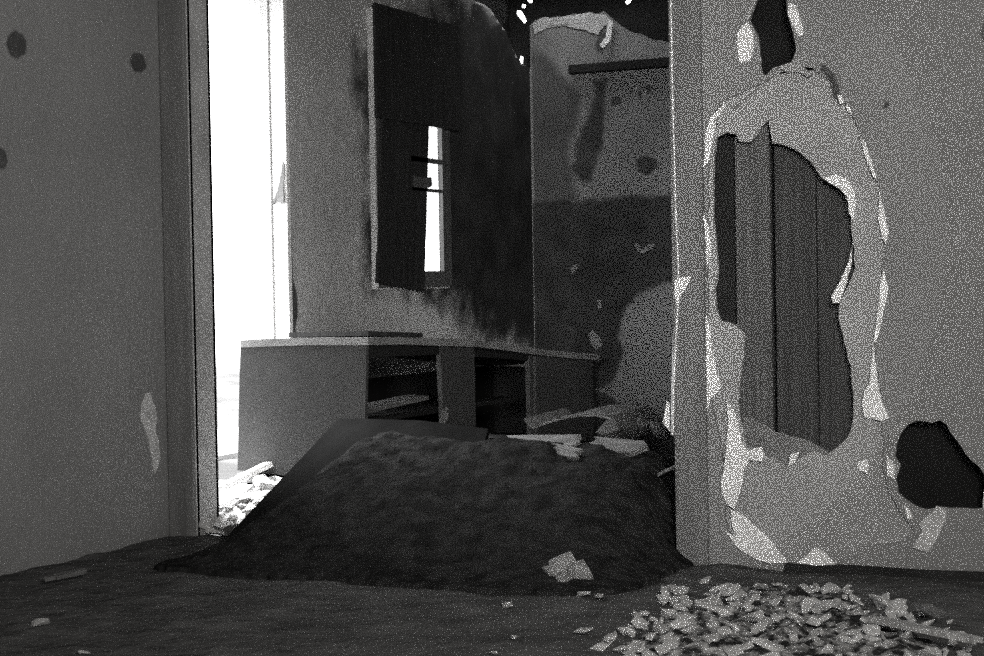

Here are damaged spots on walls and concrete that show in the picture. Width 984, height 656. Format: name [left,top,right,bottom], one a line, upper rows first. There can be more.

peeling [533,12,613,49]
peeling [663,0,692,435]
spalling [703,0,984,566]